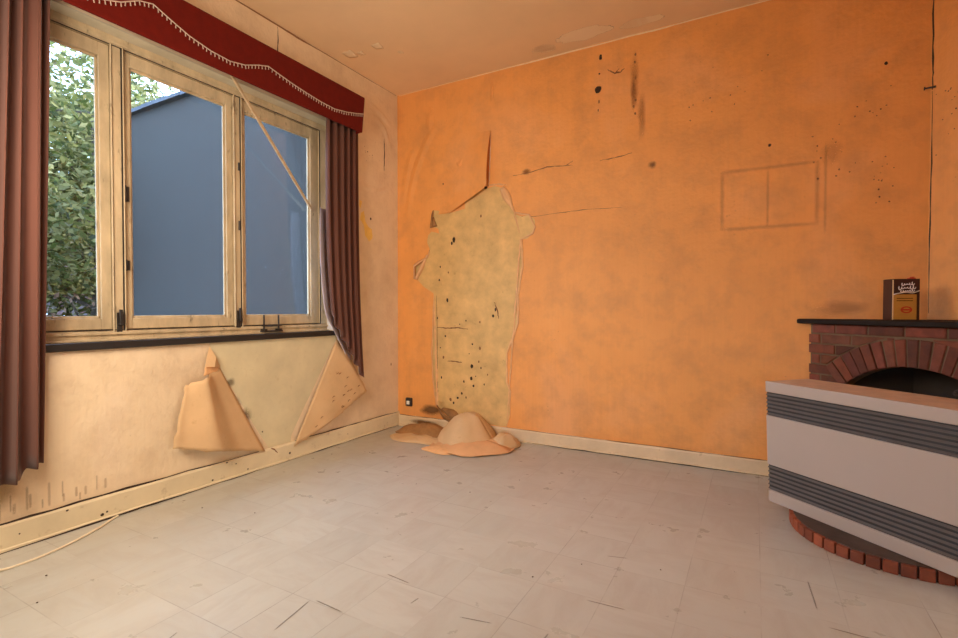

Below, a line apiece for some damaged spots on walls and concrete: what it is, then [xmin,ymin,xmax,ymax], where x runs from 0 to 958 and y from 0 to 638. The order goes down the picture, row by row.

flaking render [210,335,337,454]
flaking render [416,186,535,427]